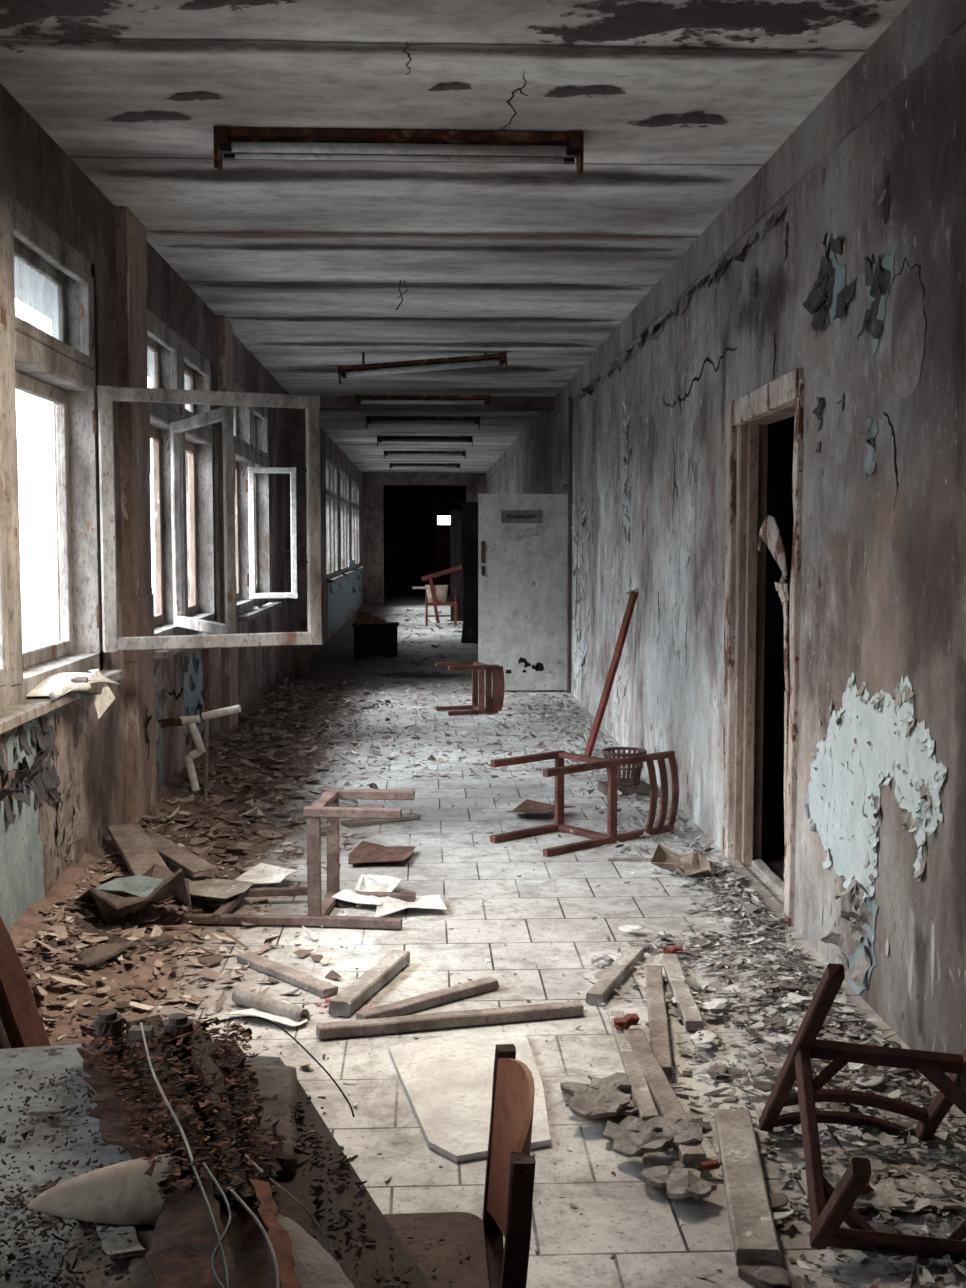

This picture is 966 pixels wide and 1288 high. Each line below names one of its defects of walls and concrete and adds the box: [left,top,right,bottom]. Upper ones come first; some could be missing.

crack [500,71,528,131]
crack [663,347,737,521]
peeling [0,710,105,930]
peeling [288,201,947,1241]
peeling [793,1058,966,1288]